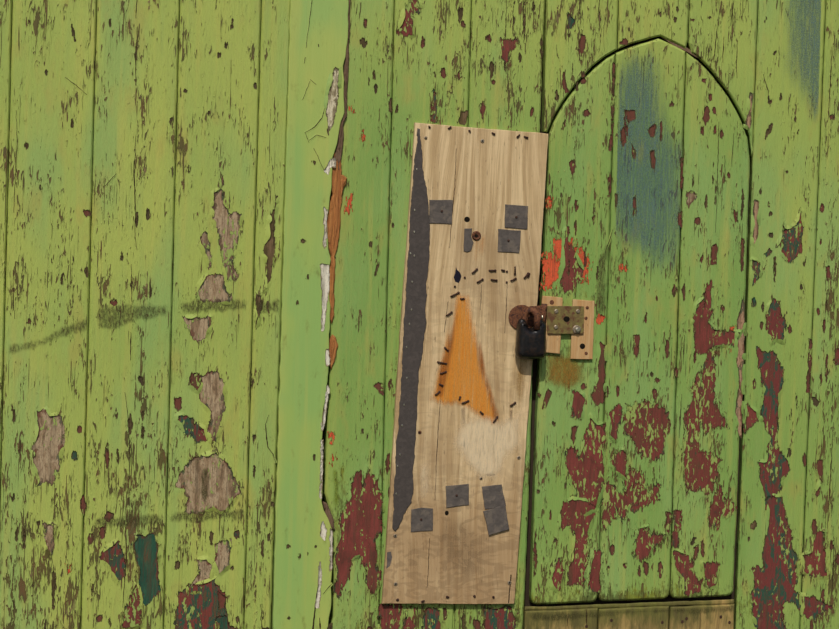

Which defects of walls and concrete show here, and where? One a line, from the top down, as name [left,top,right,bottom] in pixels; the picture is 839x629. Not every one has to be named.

peeling [195,175,244,306]
spalling [320,0,368,369]
peeling [539,199,599,296]
peeling [733,188,806,287]
peeling [18,406,82,487]
peeling [87,511,161,629]
peeling [173,530,241,629]
peeling [174,370,242,515]
peeling [298,384,448,629]
peeling [549,342,671,595]
peeling [623,509,720,597]
peeling [679,279,839,629]